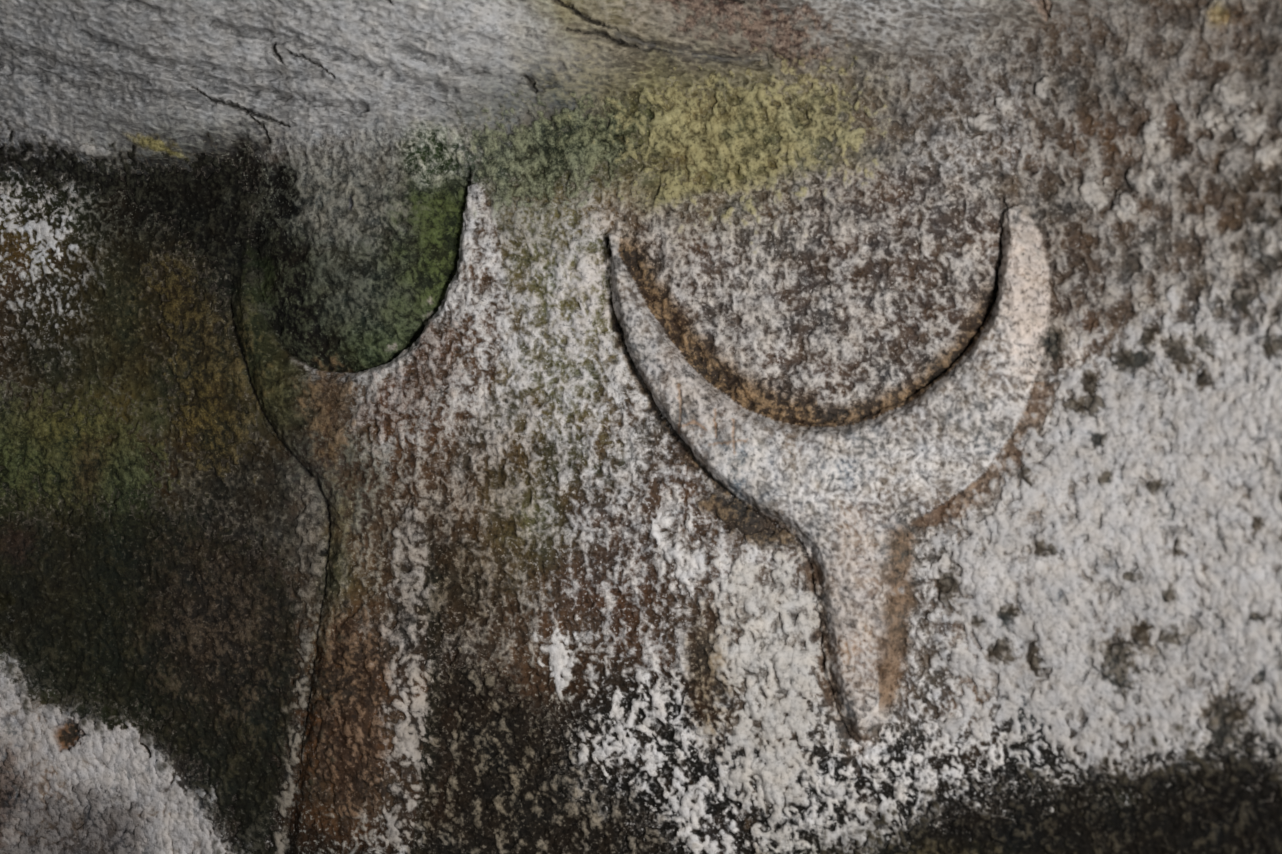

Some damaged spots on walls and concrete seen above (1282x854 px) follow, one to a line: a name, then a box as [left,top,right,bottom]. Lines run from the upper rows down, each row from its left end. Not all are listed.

crack [554,0,639,48]
leakage [0,120,268,344]
leakage [0,637,227,854]
leakage [274,474,331,854]
leakage [380,280,1282,854]